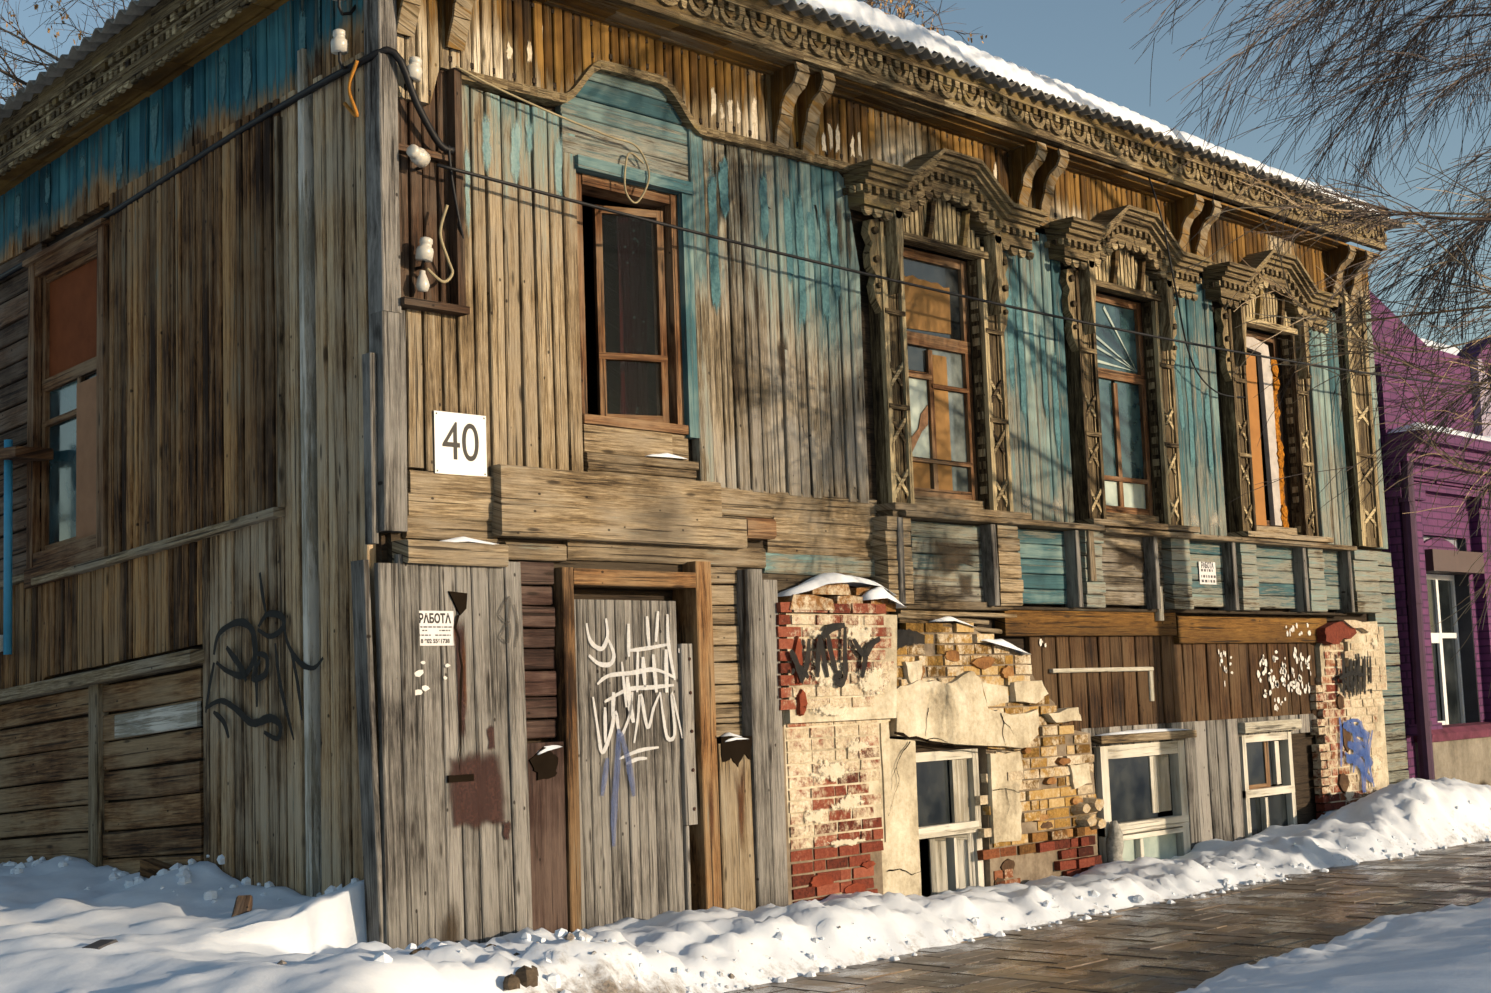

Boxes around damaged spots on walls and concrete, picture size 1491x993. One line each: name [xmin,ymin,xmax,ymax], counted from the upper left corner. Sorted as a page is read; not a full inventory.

peeling [711,88,757,124]
peeling [822,124,863,159]
peeling [708,157,730,311]
peeling [759,174,840,331]
peeling [1006,287,1061,457]
peeling [792,624,889,716]
spalling [942,650,1014,679]
spalling [1335,694,1351,752]
peeling [805,738,869,823]
spalling [1043,757,1071,785]
spalling [1337,773,1355,802]
peeling [825,837,866,847]